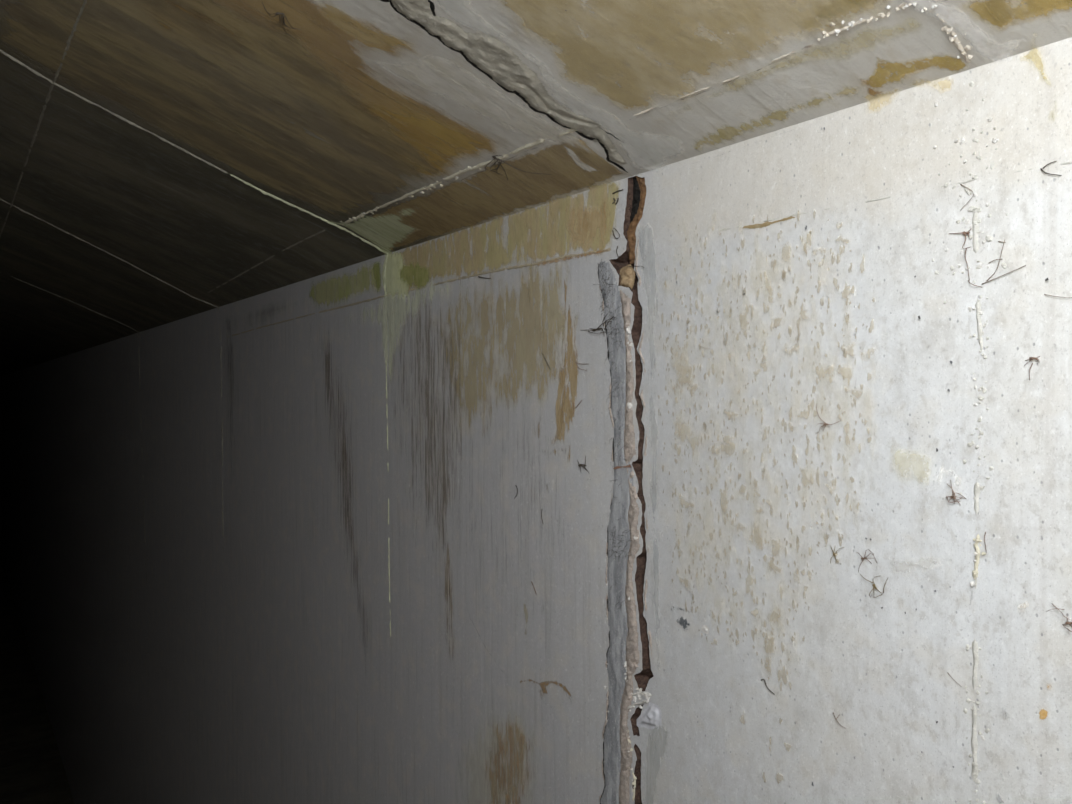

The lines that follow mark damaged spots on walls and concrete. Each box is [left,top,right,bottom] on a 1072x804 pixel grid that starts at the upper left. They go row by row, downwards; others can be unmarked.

damp [0,0,482,377]
damp [446,266,565,426]
crack [380,0,653,804]
spalling [598,261,640,804]
damp [506,0,1072,107]
damp [938,117,999,244]